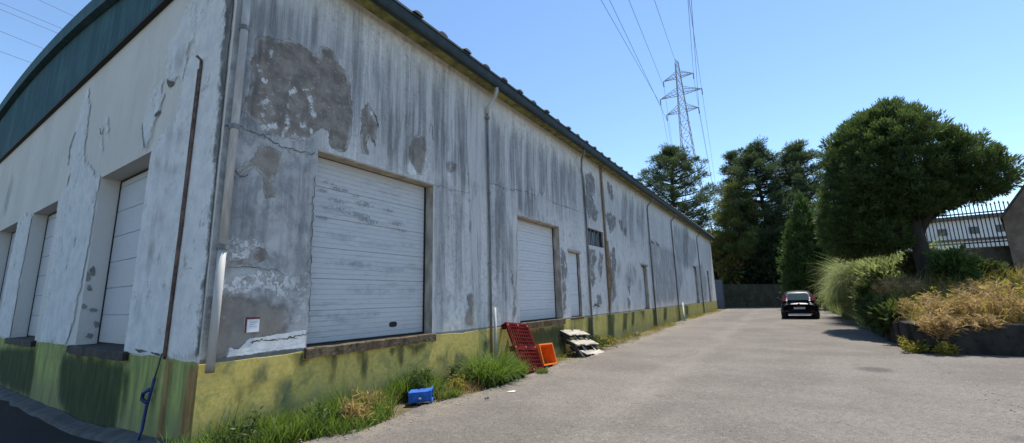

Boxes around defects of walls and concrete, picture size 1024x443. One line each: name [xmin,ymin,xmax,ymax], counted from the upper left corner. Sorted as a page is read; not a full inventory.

peeling [40,89,100,345]
peeling [124,0,310,359]
crack [225,125,319,344]
peeling [234,36,377,198]
peeling [407,132,431,176]
damp [467,80,481,310]
damp [522,137,550,221]
peeling [585,173,626,235]
peeling [589,247,630,308]